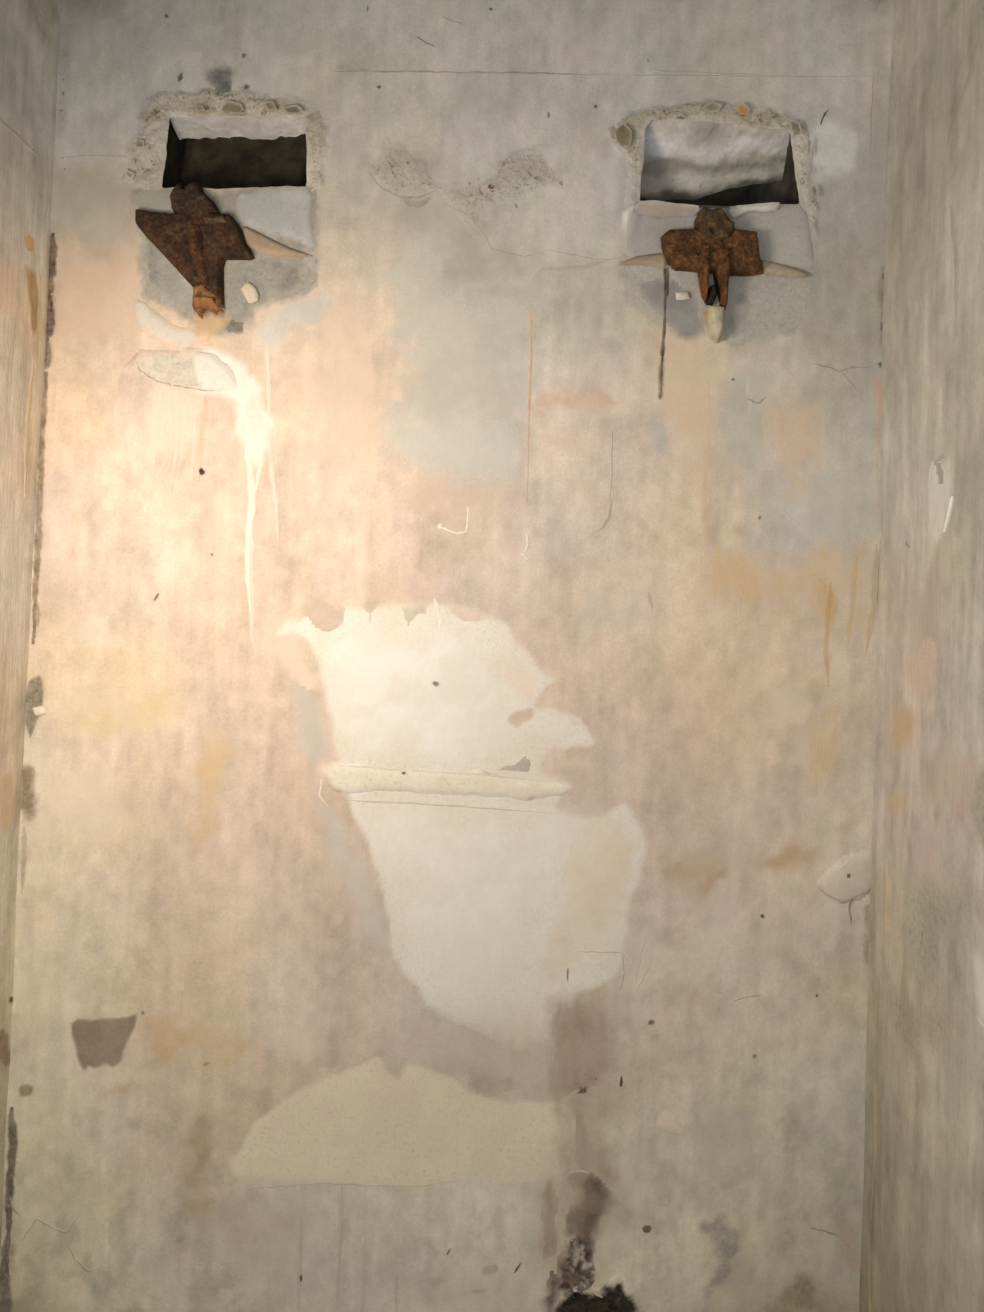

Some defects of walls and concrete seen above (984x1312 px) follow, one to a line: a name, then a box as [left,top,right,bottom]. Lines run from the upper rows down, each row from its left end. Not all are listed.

spalling [121,86,338,395]
spalling [605,99,823,358]
leakage [718,0,893,621]
efflorescence [140,342,285,656]
peeling [296,595,661,1055]
peeling [69,1010,148,1107]
peeling [227,1055,553,1192]
leakage [586,1183,621,1215]